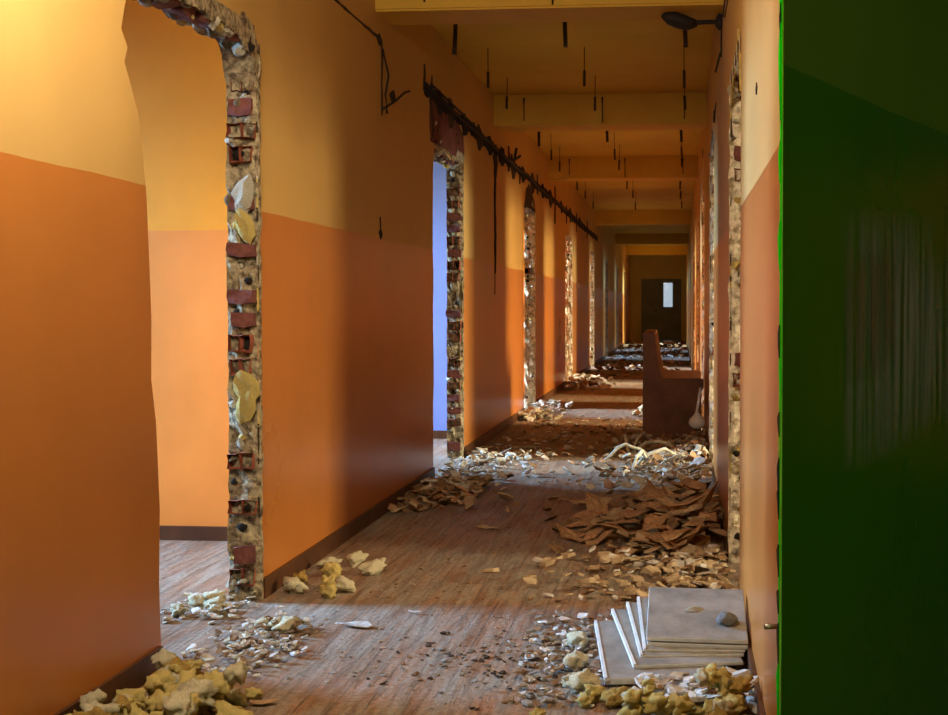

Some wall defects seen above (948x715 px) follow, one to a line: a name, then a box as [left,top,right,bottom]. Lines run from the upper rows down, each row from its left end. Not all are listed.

spalling [138,0,264,601]
spalling [429,100,464,458]
spalling [727,28,741,563]